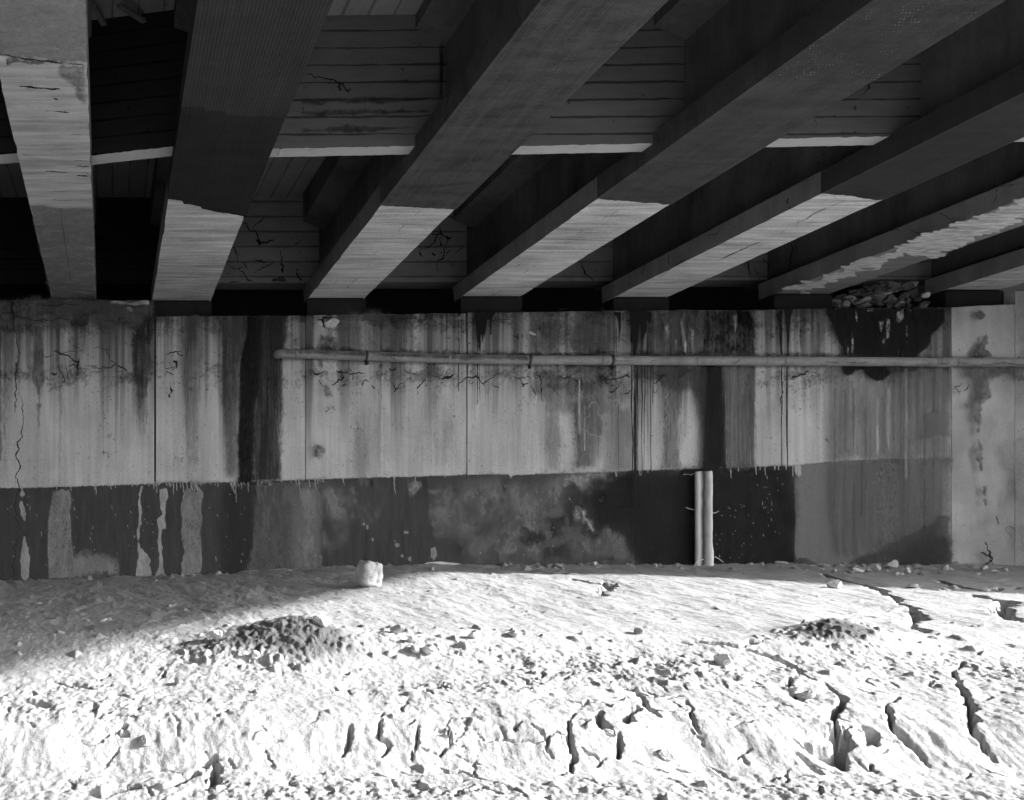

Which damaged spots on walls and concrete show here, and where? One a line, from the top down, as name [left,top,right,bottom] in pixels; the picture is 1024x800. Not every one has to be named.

crack [19,77,79,135]
crack [0,160,146,575]
leakage [221,314,287,573]
crack [311,358,696,467]
leakage [531,309,816,565]
leakage [816,308,953,565]
peeling [782,198,1024,294]
leakage [965,335,1024,471]